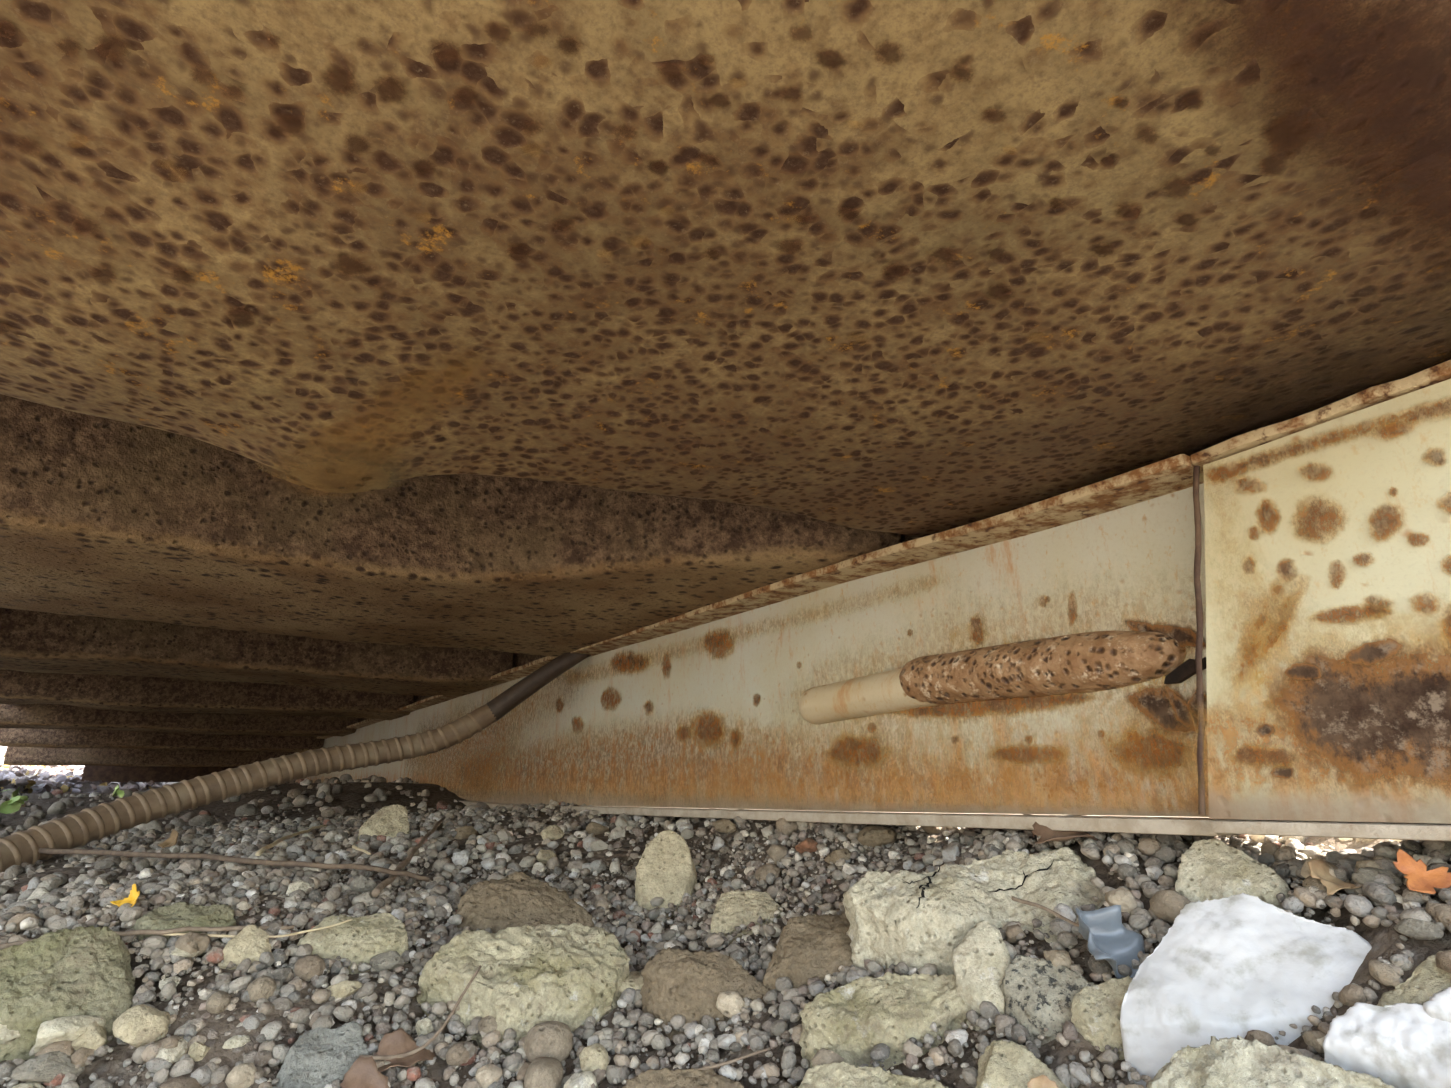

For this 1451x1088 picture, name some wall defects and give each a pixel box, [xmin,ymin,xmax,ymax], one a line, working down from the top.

rust [486,23,578,54]
rust [792,27,845,68]
rust [875,42,900,64]
rust [323,67,355,94]
rust [376,77,406,101]
rust [346,135,370,153]
rust [1261,117,1309,175]
rust [649,161,669,175]
rust [1163,178,1198,226]
rust [172,268,194,285]
rust [1207,398,1451,588]
rust [407,559,1451,811]